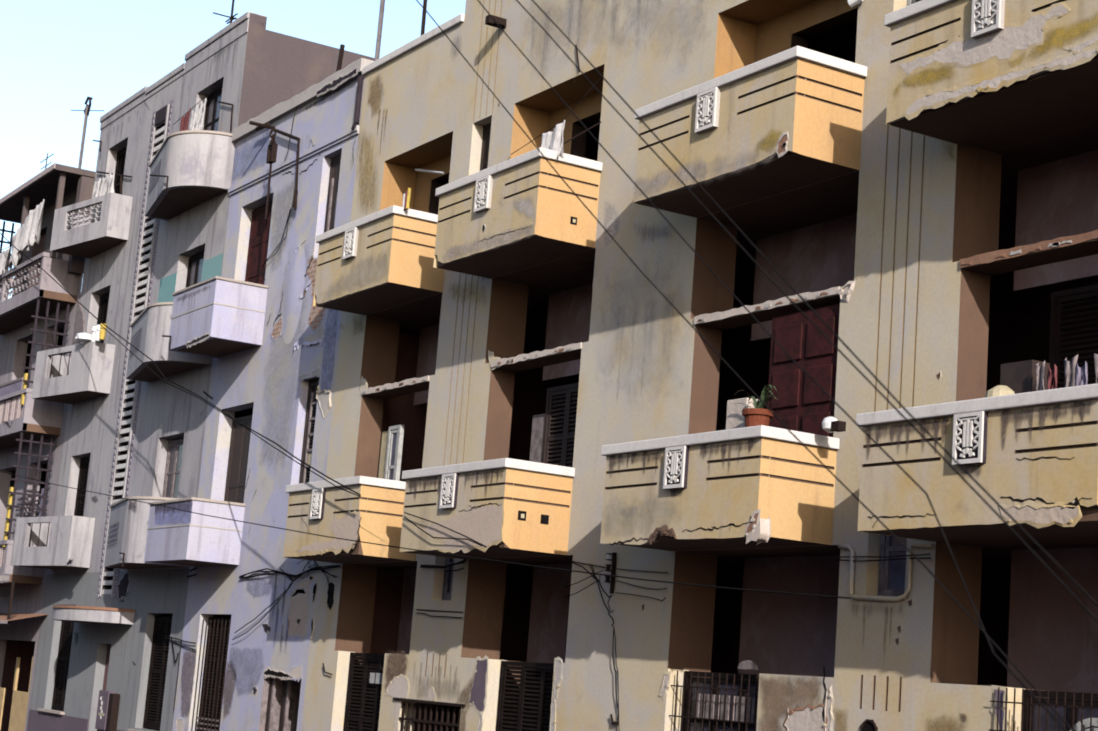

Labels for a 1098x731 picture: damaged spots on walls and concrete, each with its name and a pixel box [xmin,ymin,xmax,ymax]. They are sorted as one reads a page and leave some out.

peeling [896,2,1098,120]
peeling [273,188,293,261]
peeling [995,240,1072,258]
flaking render [755,281,856,310]
peeling [290,254,338,419]
peeling [294,510,360,556]
flaking render [999,500,1083,528]
peeling [229,648,303,694]
water stain [761,678,820,731]
flaking render [783,685,835,731]